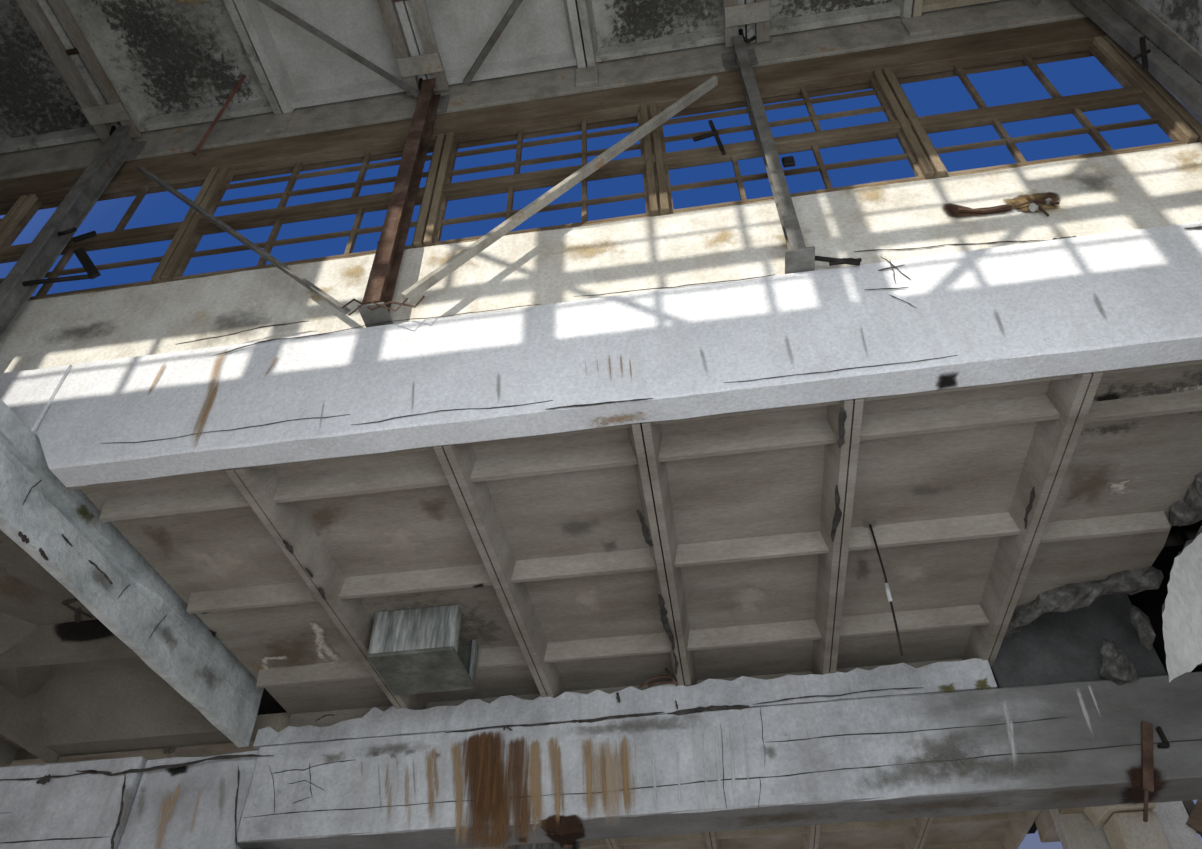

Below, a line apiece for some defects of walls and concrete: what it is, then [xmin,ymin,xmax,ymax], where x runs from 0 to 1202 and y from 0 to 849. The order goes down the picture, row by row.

water stain [101,0,252,114]
mould [613,0,716,42]
mould [783,0,892,16]
spalling [1097,393,1119,401]
crack [636,509,653,547]
spalling [1168,472,1202,527]
spalling [1000,566,1164,648]
crack [445,594,1202,808]
crack [0,754,470,849]
rust [452,732,564,847]
rust [585,737,631,815]
rust [1122,767,1165,805]